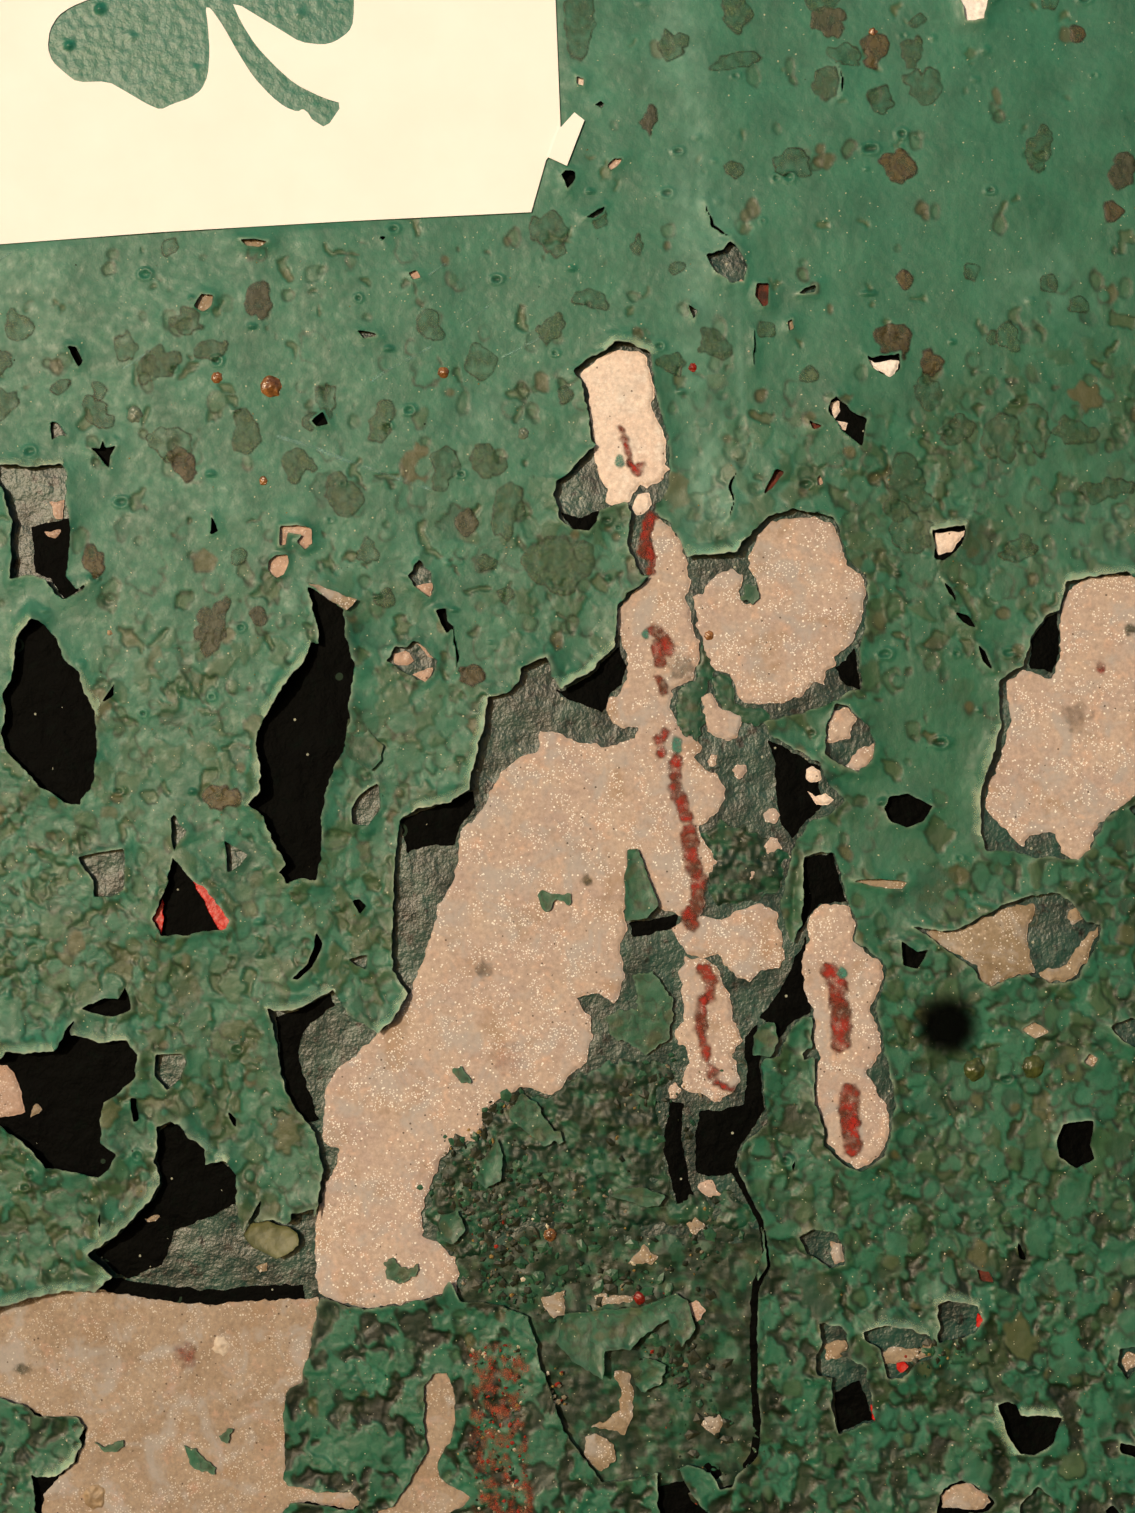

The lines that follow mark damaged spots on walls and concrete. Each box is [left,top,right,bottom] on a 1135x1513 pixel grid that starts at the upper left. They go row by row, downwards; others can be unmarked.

corrosion [619,426,643,477]
corrosion [637,511,658,575]
corrosion [647,626,674,695]
peeling [974,568,1135,859]
corrosion [653,728,706,931]
peeling [0,336,906,1513]
peeling [914,893,1101,986]
corrosion [695,964,734,1091]
corrosion [820,962,852,1053]
corrosion [838,1083,863,1157]
corrosion [469,1344,532,1513]
corrosion [546,1368,567,1405]